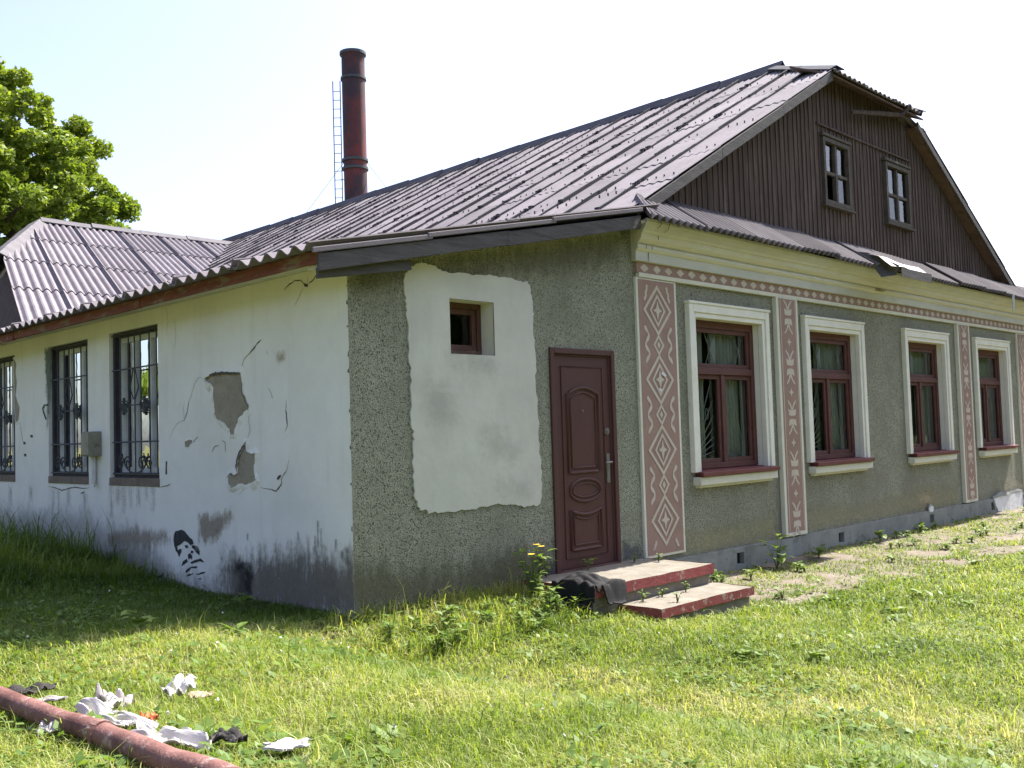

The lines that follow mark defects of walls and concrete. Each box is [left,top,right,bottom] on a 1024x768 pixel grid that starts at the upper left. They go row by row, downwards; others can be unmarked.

crack [285,275,316,302]
spalling [203,365,260,493]
crack [240,461,289,493]
damp [224,541,556,618]